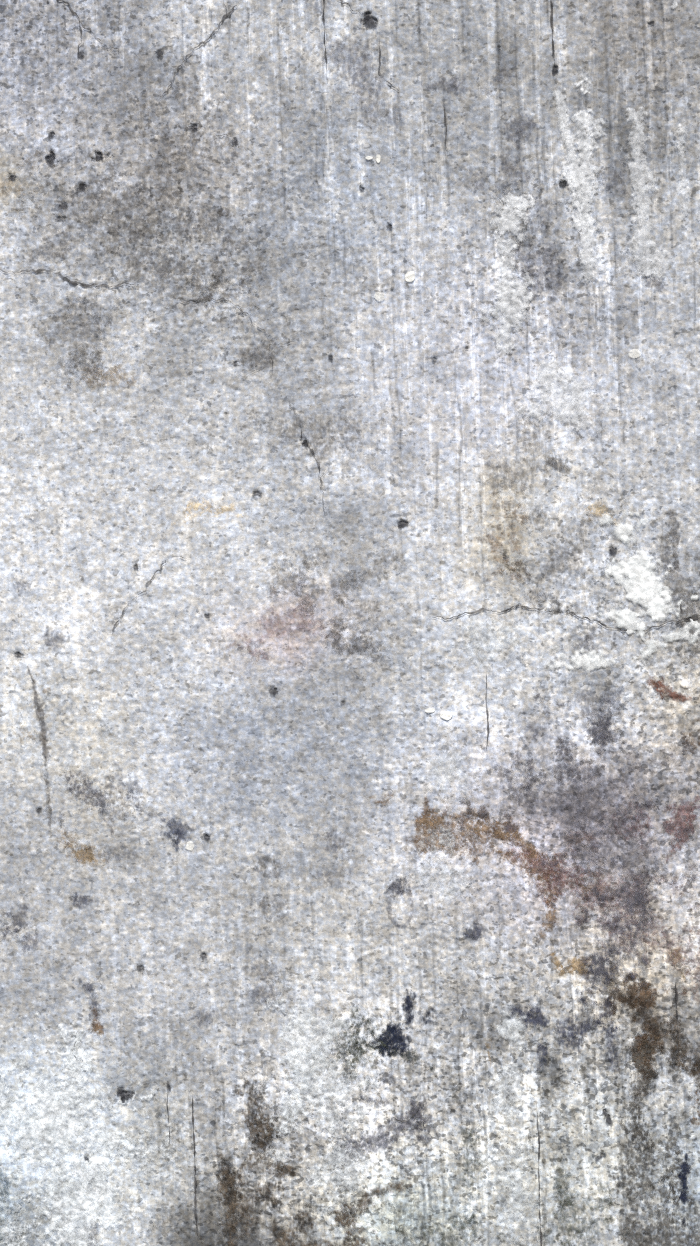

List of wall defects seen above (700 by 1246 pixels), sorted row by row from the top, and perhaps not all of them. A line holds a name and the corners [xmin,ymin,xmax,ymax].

crack [2,269,134,288]
crack [433,604,700,632]
corrosion [615,796,700,861]
corrosion [413,797,565,938]
corrosion [551,952,591,975]
damp [361,989,434,1058]
corrosion [604,973,664,1080]
damp [497,896,700,1246]
damp [217,999,432,1246]